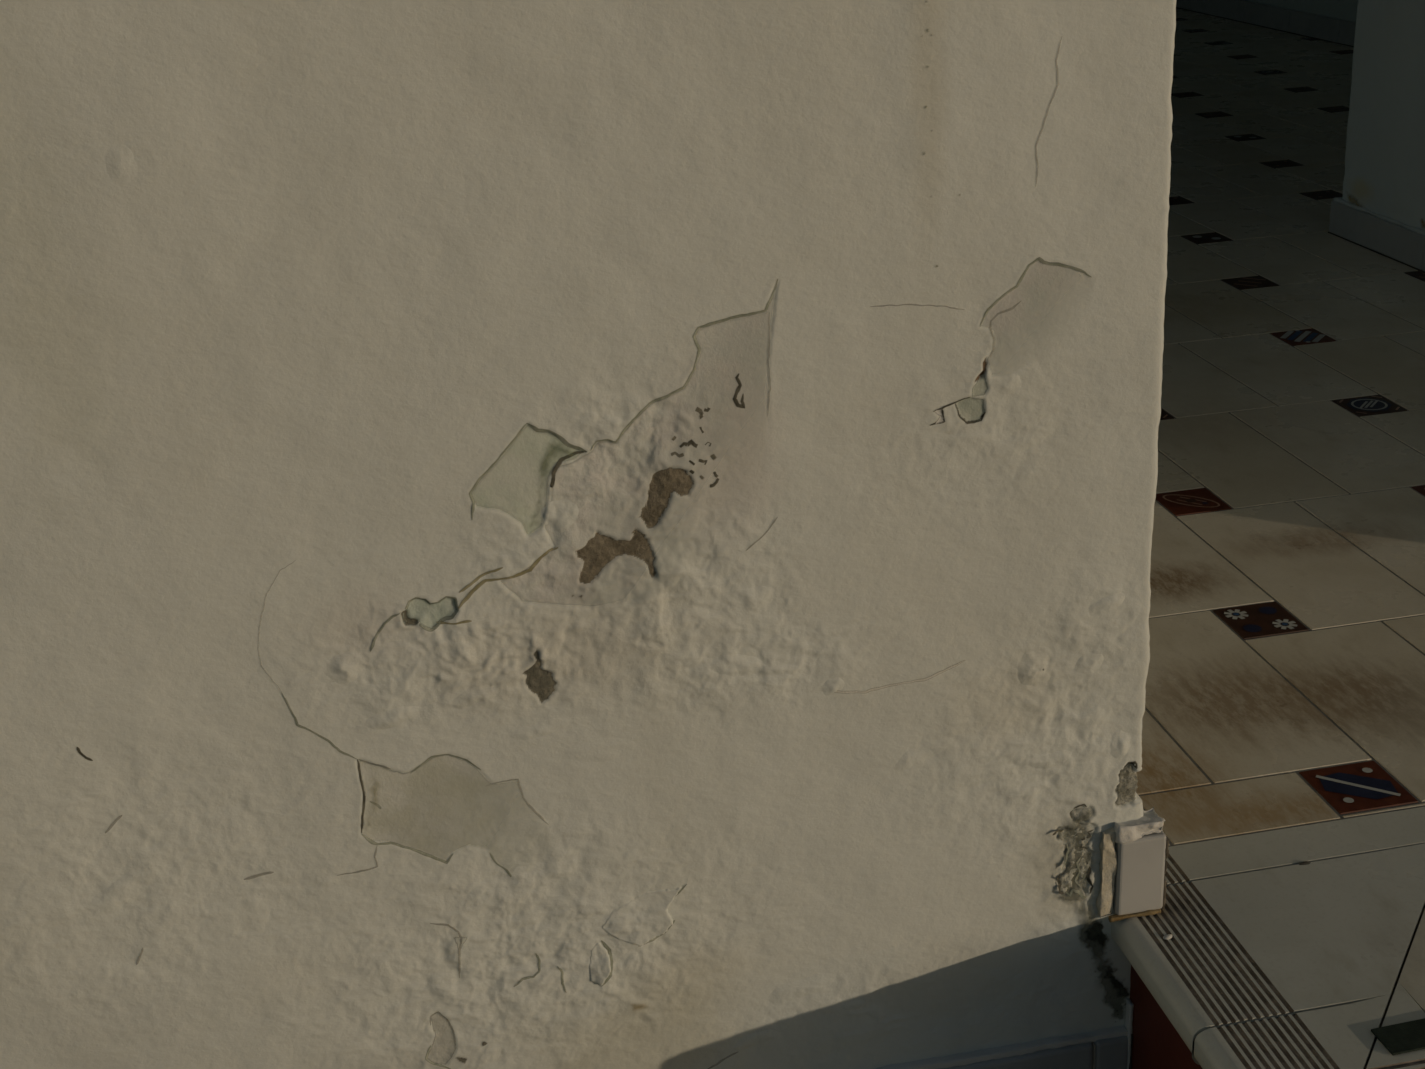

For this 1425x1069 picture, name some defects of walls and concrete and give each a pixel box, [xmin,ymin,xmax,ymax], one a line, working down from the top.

crack [1036,38,1062,183]
peeling [931,257,1091,425]
peeling [469,279,778,605]
peeling [401,596,458,631]
crack [281,692,356,759]
peeling [337,754,549,876]
spalling [523,651,556,703]
spalling [1116,761,1138,805]
damp [1064,816,1129,1019]
peeling [425,1012,467,1069]